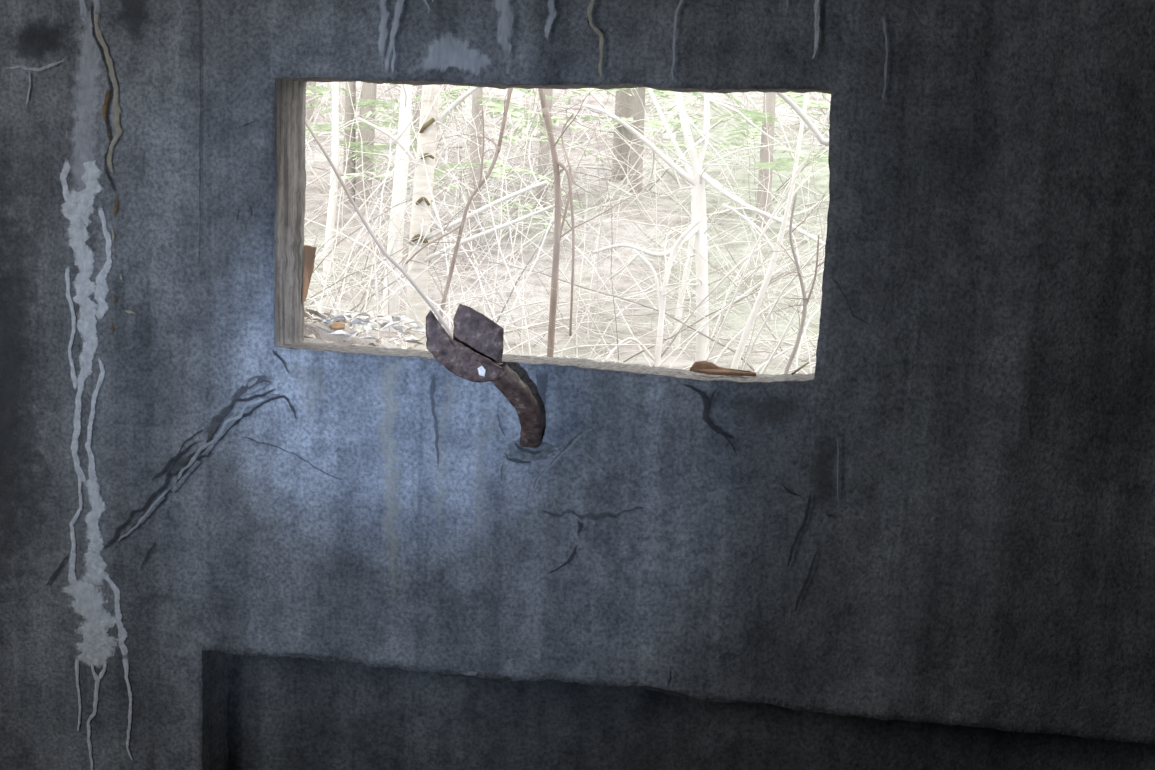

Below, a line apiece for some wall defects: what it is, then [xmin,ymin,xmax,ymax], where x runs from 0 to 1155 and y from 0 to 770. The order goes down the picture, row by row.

damp [422,33,492,74]
damp [494,0,513,53]
damp [545,0,556,37]
crack [91,3,136,335]
damp [60,0,133,770]
crack [682,384,737,455]
crack [105,350,339,568]
crack [533,432,643,573]
crack [47,554,69,585]